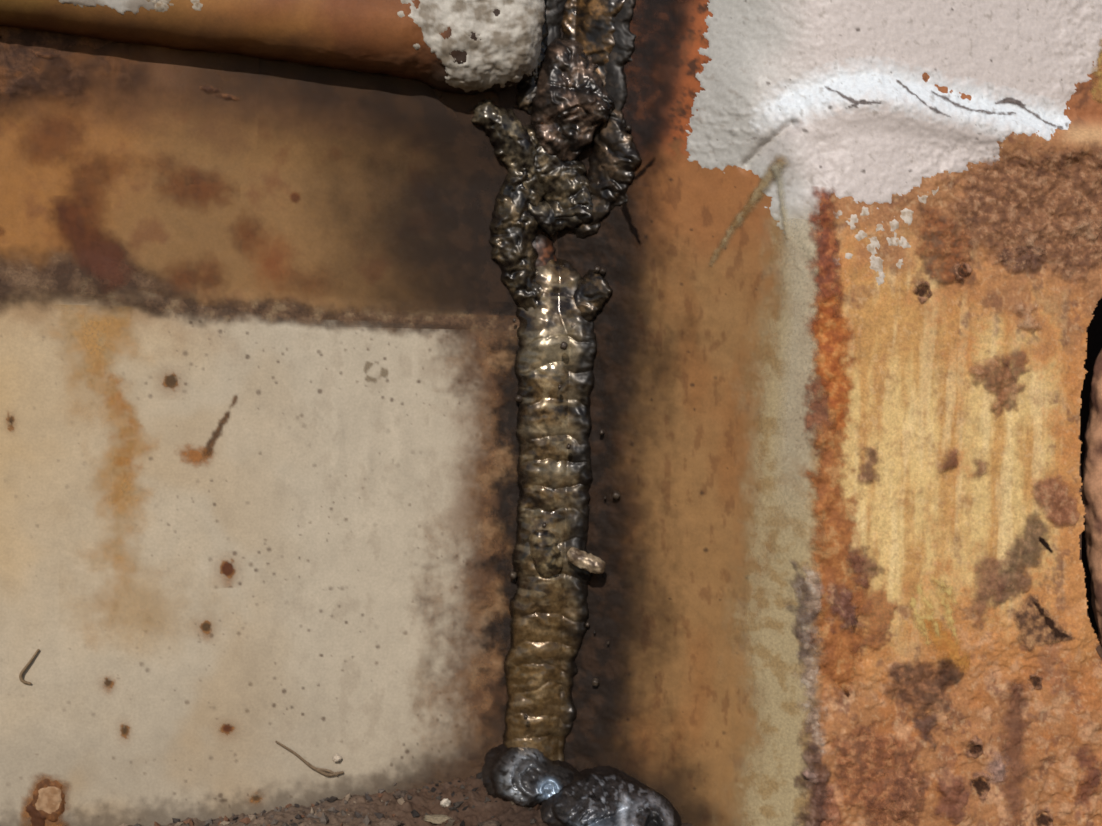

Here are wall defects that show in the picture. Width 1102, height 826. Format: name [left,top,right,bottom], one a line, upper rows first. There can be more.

rust [0,26,141,111]
peeling [59,0,174,15]
peeling [397,0,545,93]
crack [827,88,881,107]
peeling [686,0,1102,286]
crack [897,80,1063,129]
rust [805,190,866,690]
rust [860,449,876,481]
rust [943,451,958,470]
rust [22,777,67,826]
rust [796,727,831,826]
rust [989,688,1026,814]